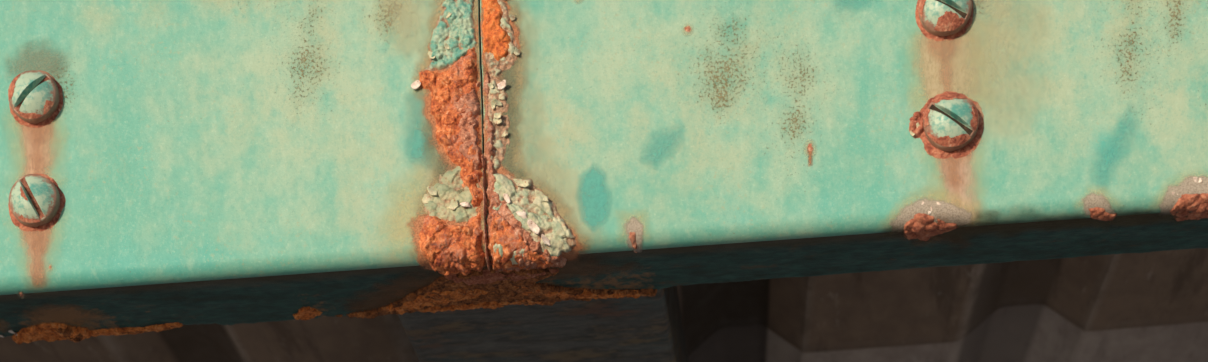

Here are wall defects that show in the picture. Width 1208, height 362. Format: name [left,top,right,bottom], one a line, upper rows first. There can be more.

rust [8,70,66,285]
rust [890,0,984,241]